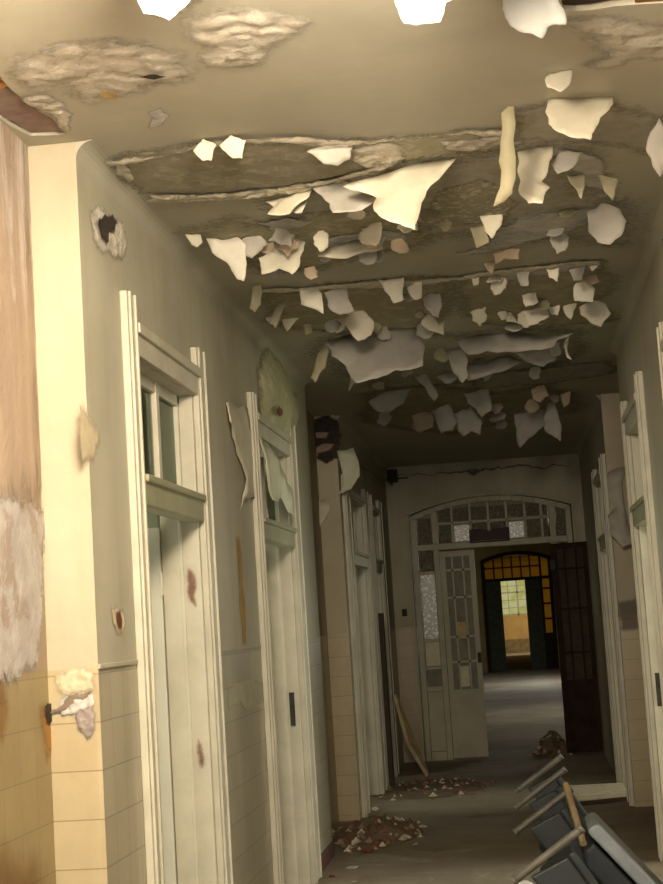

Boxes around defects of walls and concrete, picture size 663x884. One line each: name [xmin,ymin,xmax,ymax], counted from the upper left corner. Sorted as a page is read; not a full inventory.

spalling [138,0,310,68]
peeling [395,0,451,25]
spalling [502,0,663,69]
peeling [0,38,189,504]
peeling [105,70,663,448]
peeling [226,401,295,516]
spalling [45,668,95,739]